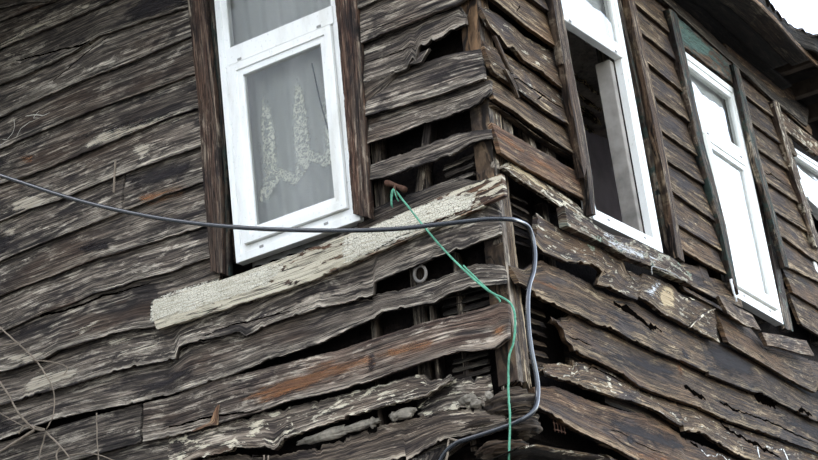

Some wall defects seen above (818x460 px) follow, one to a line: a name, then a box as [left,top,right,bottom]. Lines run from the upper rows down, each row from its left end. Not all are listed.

crack [513,77,563,109]
crack [613,301,662,332]
crack [684,384,818,459]